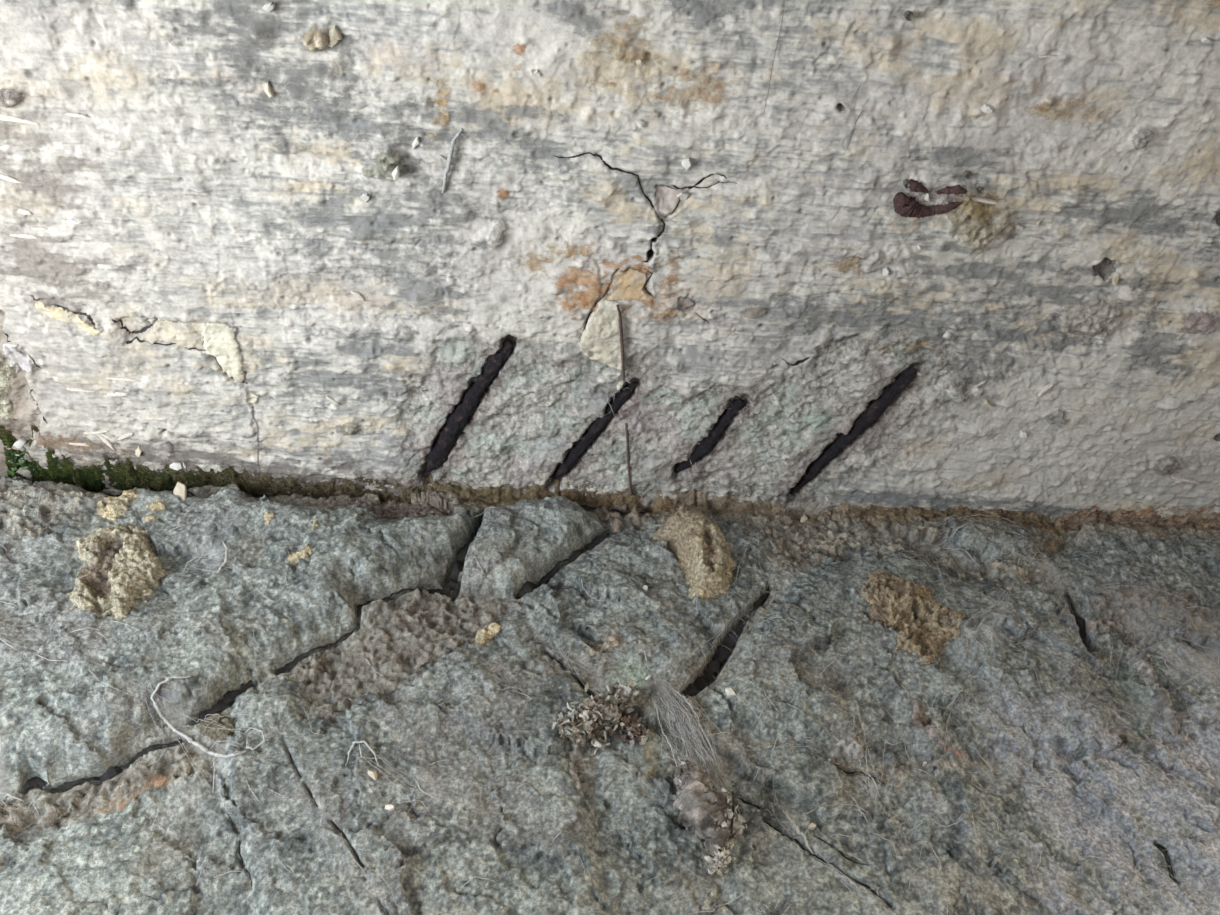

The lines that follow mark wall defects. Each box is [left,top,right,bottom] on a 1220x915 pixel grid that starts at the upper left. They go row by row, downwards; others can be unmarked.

crack [555,152,737,342]
peeling [3,346,35,372]
spalling [398,269,992,523]
crack [518,504,648,597]
crack [23,510,484,791]
crack [543,649,595,697]
crack [681,588,769,698]